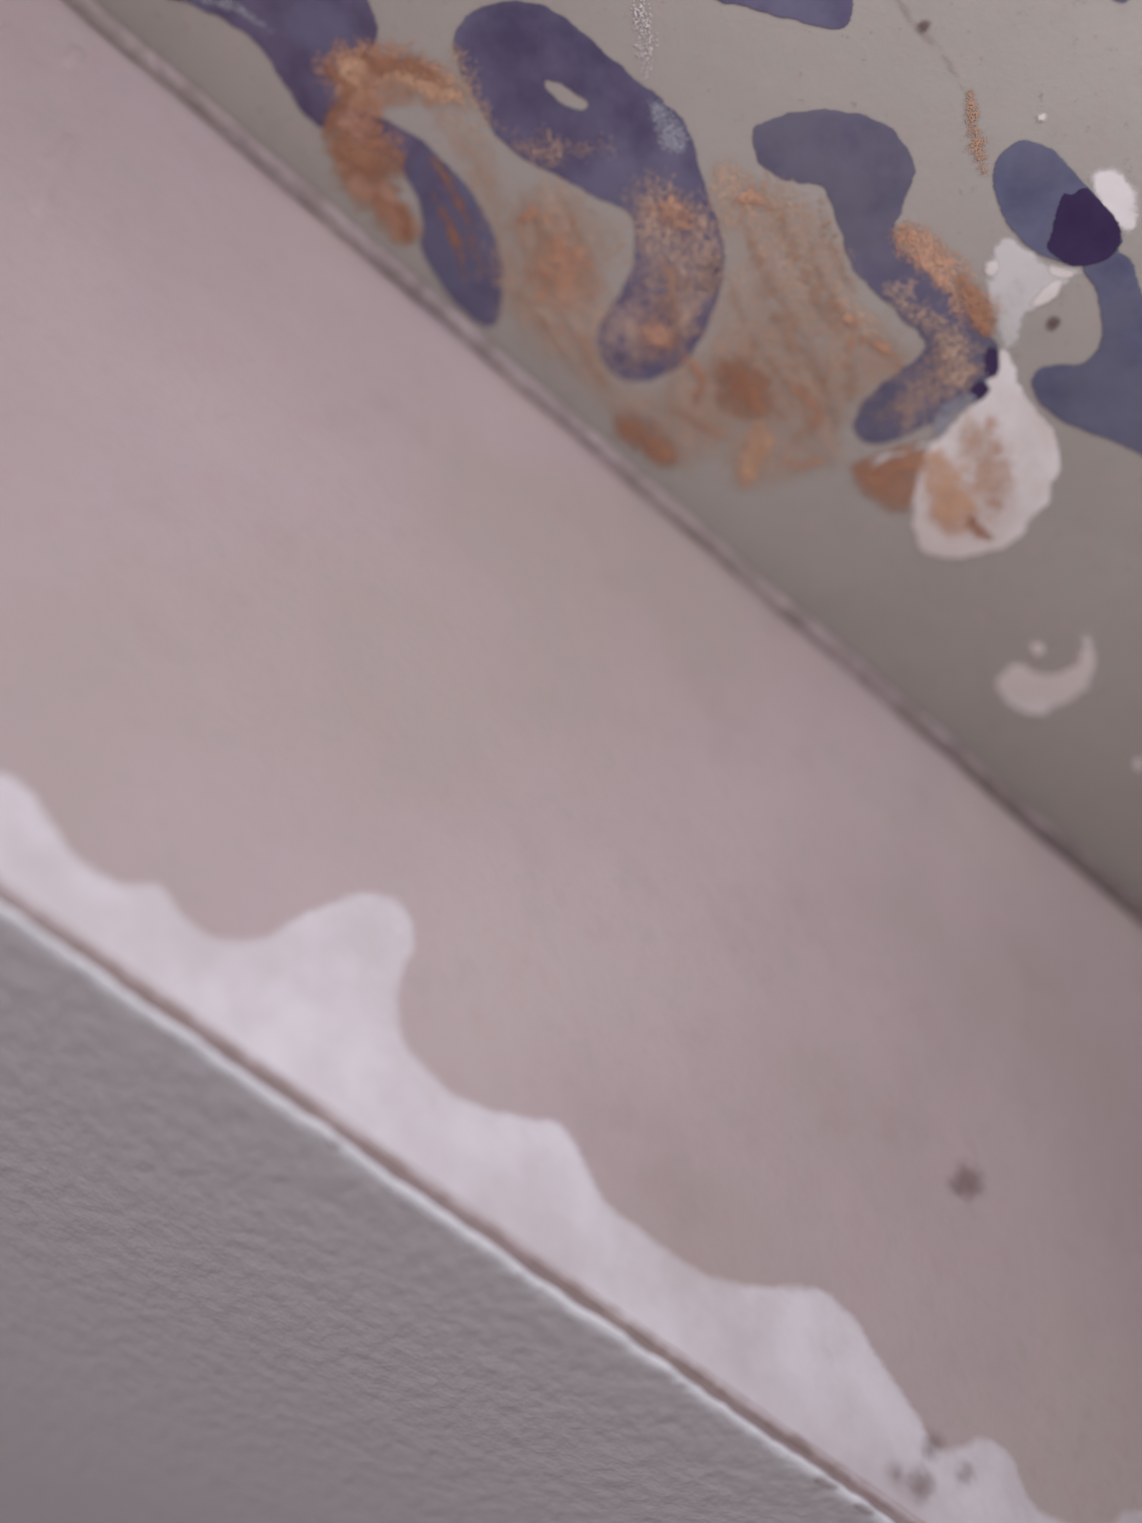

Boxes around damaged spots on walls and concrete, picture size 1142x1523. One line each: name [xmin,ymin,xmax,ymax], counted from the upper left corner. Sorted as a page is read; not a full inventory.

corrosion [963,88,990,174]
peeling [1092,170,1138,231]
peeling [910,239,1077,559]
peeling [994,635,1097,715]